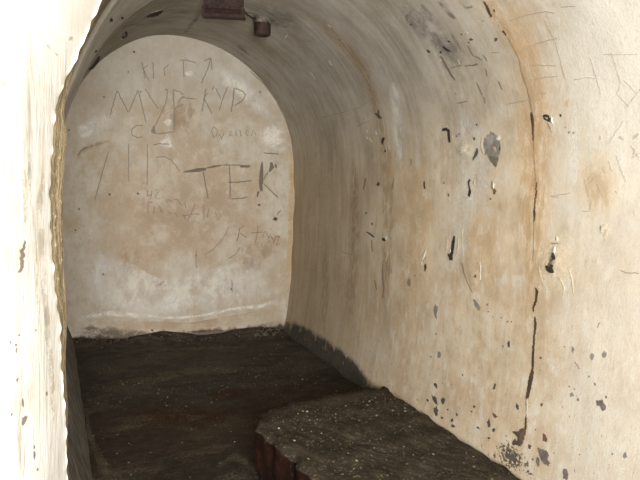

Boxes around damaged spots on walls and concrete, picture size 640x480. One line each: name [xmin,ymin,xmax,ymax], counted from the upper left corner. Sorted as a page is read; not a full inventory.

spalling [481,132,501,167]
crack [502,30,537,262]
peeling [18,241,26,273]
spalling [445,230,463,260]
spalling [545,237,560,273]
water stain [85,252,271,337]
crack [524,288,539,435]
spalling [512,428,550,467]